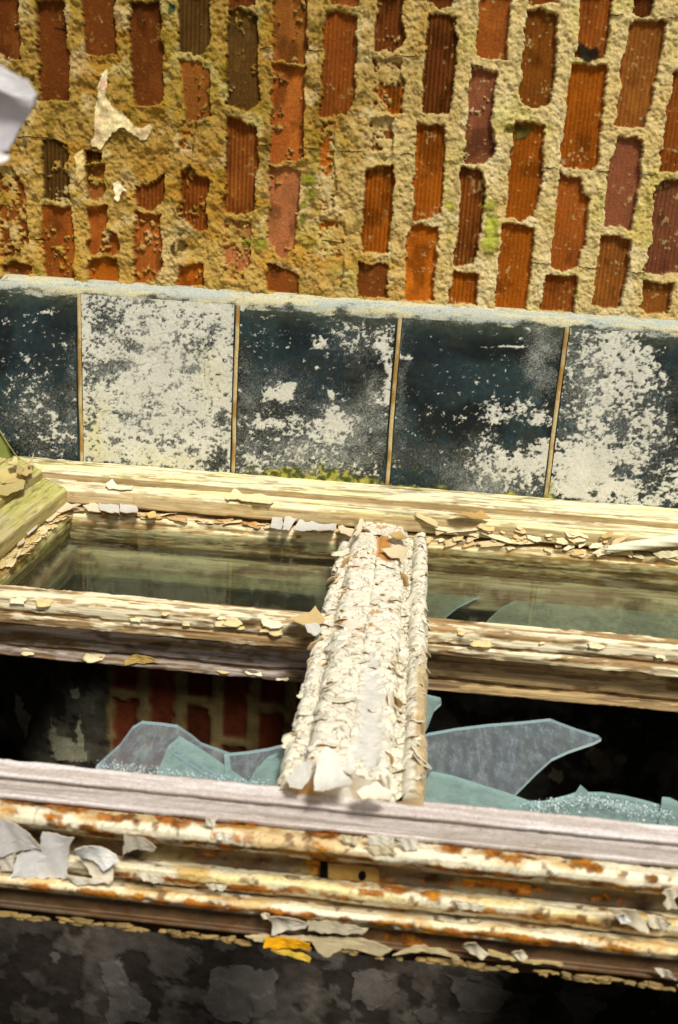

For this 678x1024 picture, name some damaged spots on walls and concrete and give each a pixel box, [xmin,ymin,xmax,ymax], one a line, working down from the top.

leakage [0,274,678,507]
peeling [0,453,34,496]
peeling [0,502,678,801]
peeling [0,817,156,886]
rust [69,888,241,911]
rust [2,800,374,878]
rust [223,884,306,894]
rust [254,908,352,922]
rust [320,845,665,903]
rust [367,920,638,955]
peeling [608,887,678,934]
peeling [0,911,678,1024]